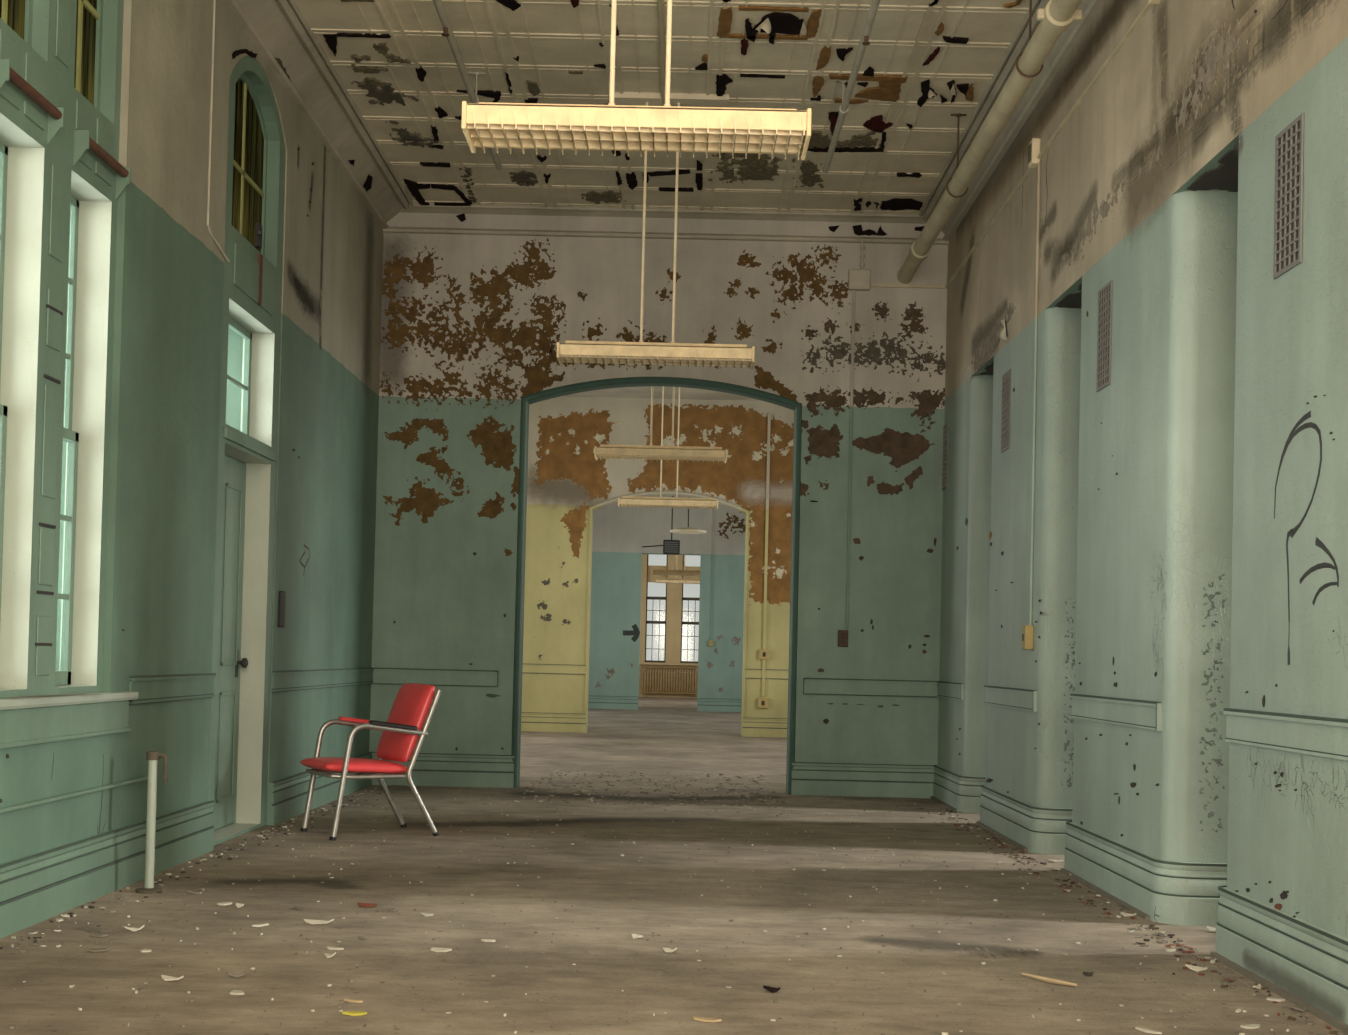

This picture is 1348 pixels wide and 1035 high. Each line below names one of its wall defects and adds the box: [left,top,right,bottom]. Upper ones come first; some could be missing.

peeling [232,49,257,59]
peeling [323,33,478,222]
peeling [457,56,540,103]
peeling [496,0,521,11]
peeling [509,155,551,186]
peeling [581,0,973,204]
water stain [1128,0,1257,216]
peeling [379,237,668,588]
peeling [627,198,946,606]
peeling [537,600,571,625]